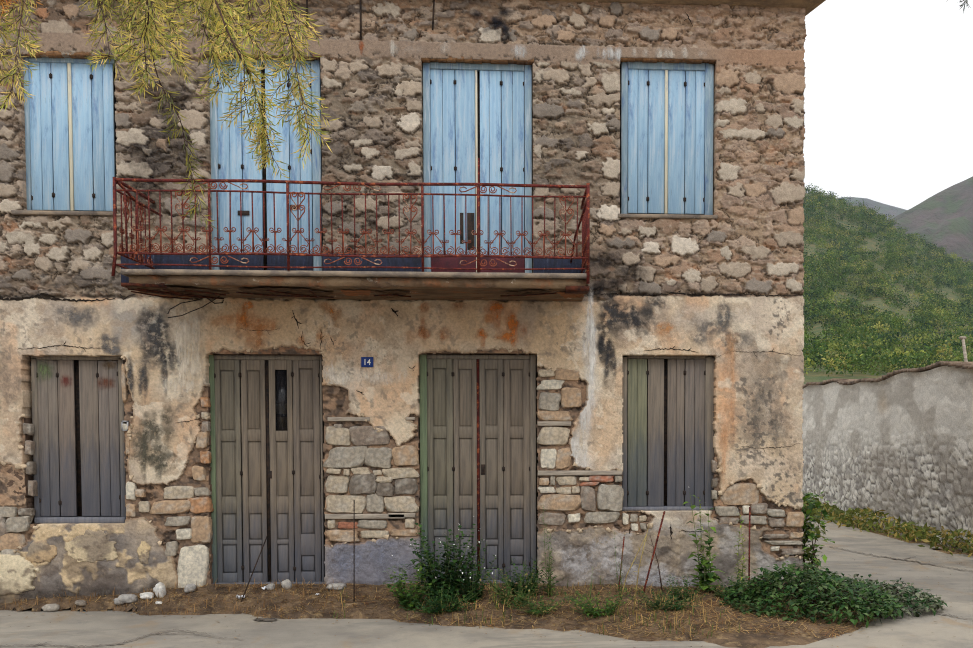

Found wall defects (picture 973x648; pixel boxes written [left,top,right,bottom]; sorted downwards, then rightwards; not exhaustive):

crack [19,342,94,350]
damp [127,362,147,394]
crack [644,346,791,356]
flaking render [0,414,39,555]
damp [141,434,161,475]
flaking render [121,355,214,588]
flaking render [322,383,420,548]
flaking render [536,367,654,535]
flaking render [711,453,805,560]